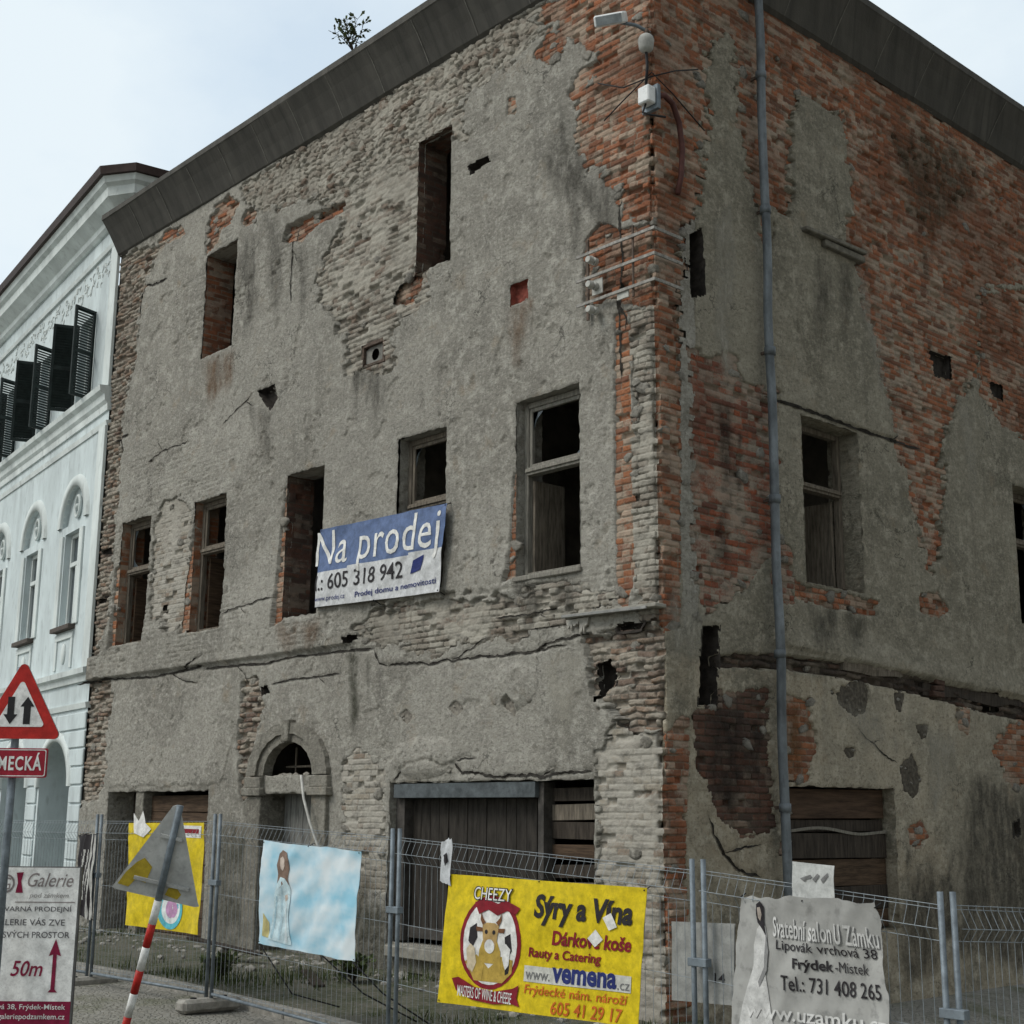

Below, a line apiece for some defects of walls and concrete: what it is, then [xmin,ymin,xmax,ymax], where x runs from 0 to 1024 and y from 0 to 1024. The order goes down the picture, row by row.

flaking render [205,7,567,377]
spalling [683,228,706,298]
spalling [928,348,951,379]
spalling [93,226,185,656]
spalling [344,223,670,660]
spalling [83,680,114,803]
spalling [237,676,270,801]
crack [78,608,590,685]
spalling [341,748,390,897]
crack [455,757,592,779]
spalling [597,658,621,699]
crack [709,818,762,877]